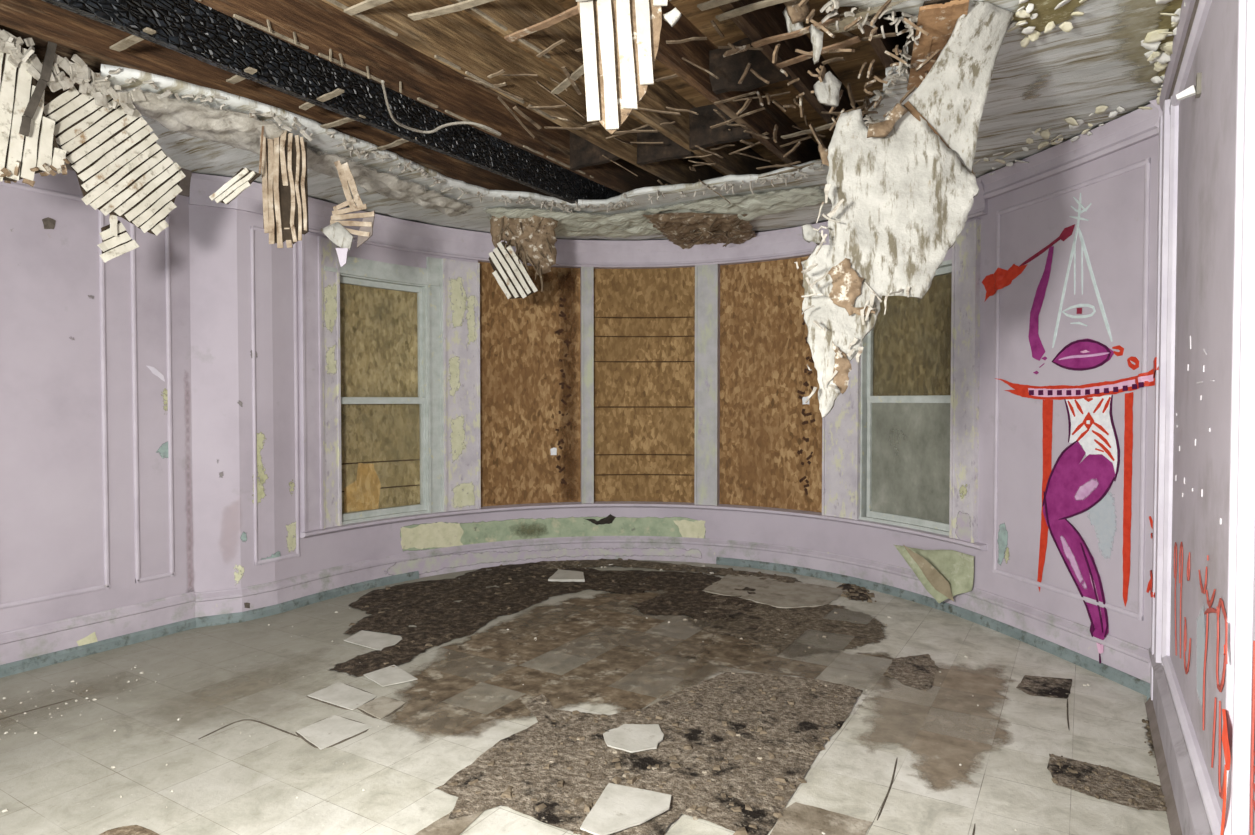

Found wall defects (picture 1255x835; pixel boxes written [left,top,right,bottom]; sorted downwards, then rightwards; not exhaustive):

peeling [663,0,681,27]
flaking render [783,0,927,128]
peeling [973,0,1185,175]
spalling [0,159,70,187]
flaking render [95,68,829,249]
flaking render [320,210,375,267]
peeling [330,482,886,677]
peeling [893,544,974,604]
peeling [888,654,939,692]
peeling [415,672,872,835]
peeling [1047,754,1167,812]
peeling [99,825,159,835]